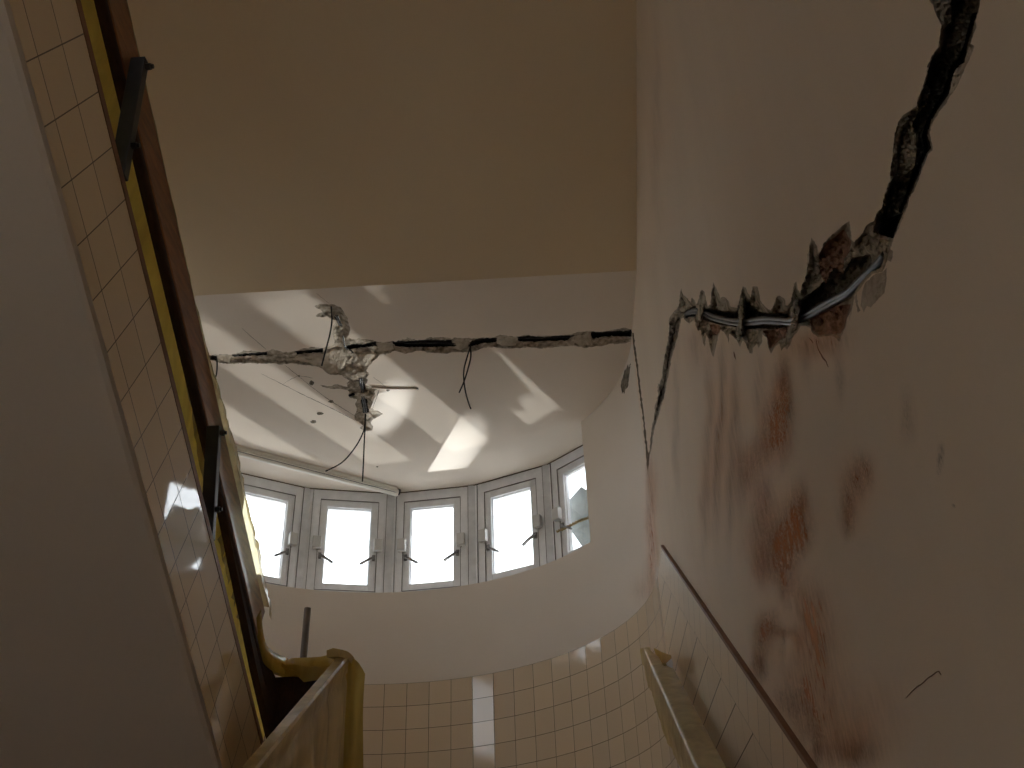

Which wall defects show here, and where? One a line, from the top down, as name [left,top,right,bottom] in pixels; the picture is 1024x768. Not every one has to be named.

peeling [930,0,951,25]
peeling [949,48,972,94]
peeling [893,85,930,176]
flaking render [621,363,631,394]